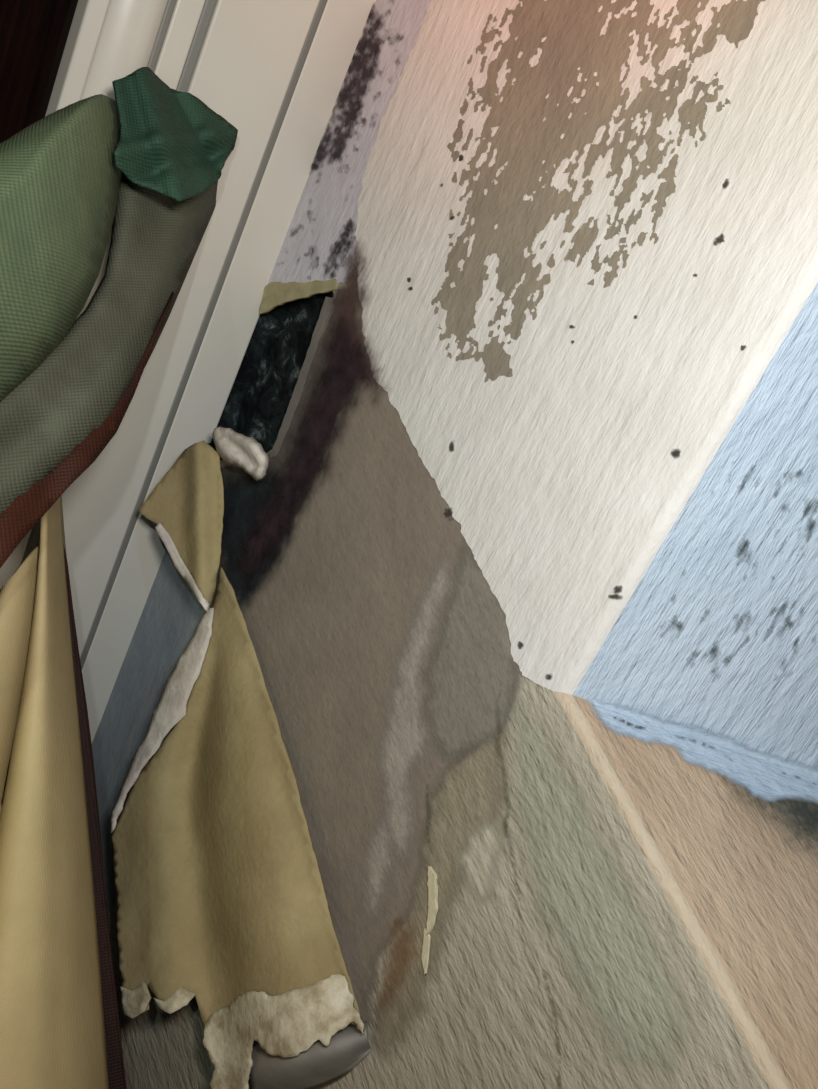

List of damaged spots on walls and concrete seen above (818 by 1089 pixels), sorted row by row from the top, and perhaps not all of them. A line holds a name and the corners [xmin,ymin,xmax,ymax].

spalling [207,291,335,460]
water stain [219,219,378,606]
water stain [311,6,403,170]
peeling [431,0,765,382]
flaking render [237,304,523,1052]
water stain [746,789,818,841]